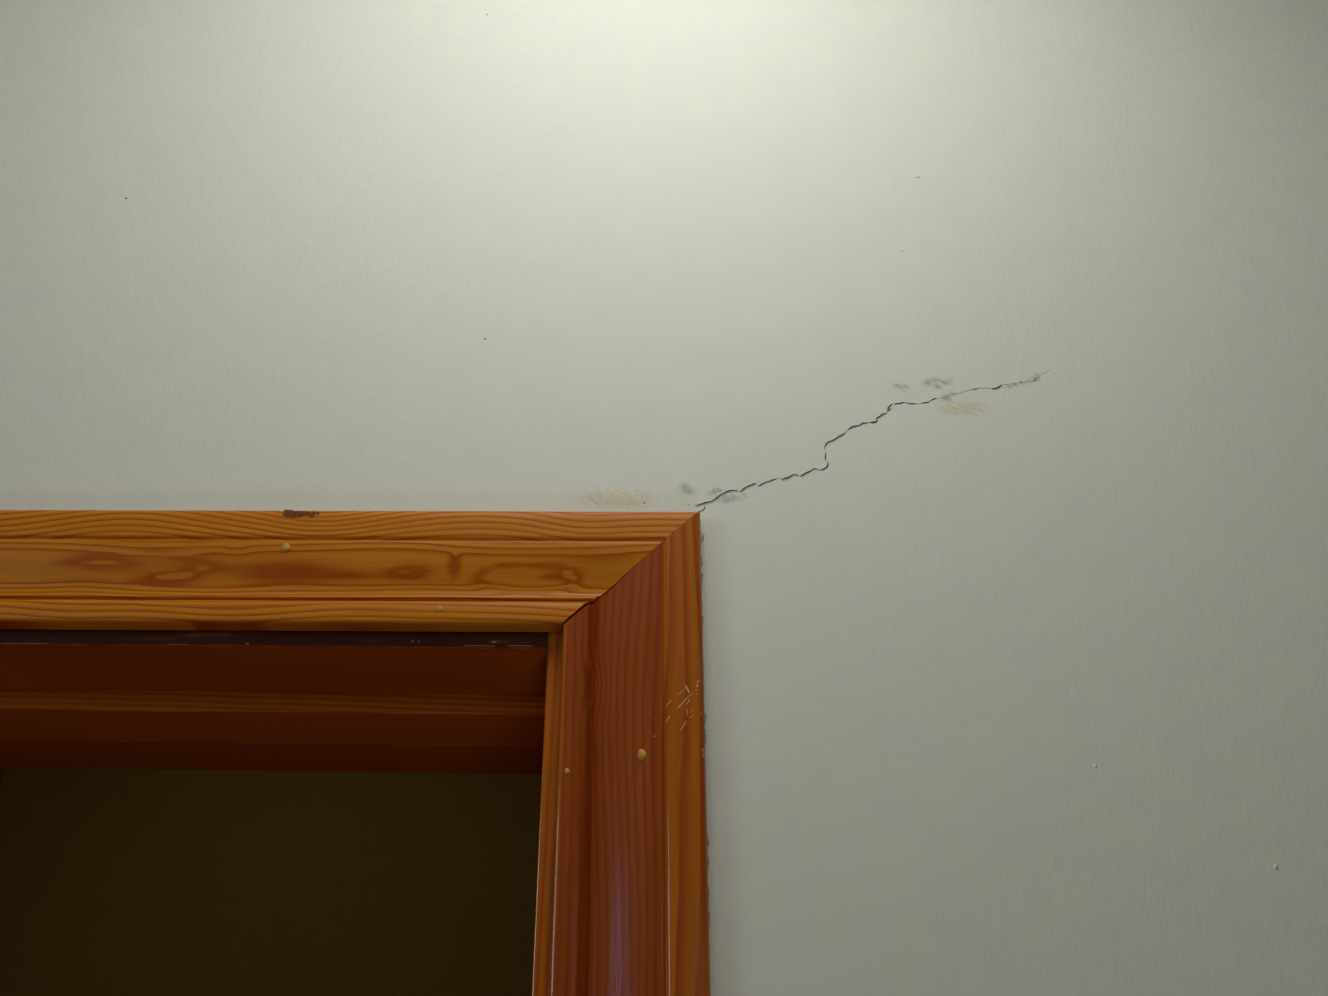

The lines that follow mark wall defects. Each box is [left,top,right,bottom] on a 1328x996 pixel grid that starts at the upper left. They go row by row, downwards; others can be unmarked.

crack [695,370,1050,512]